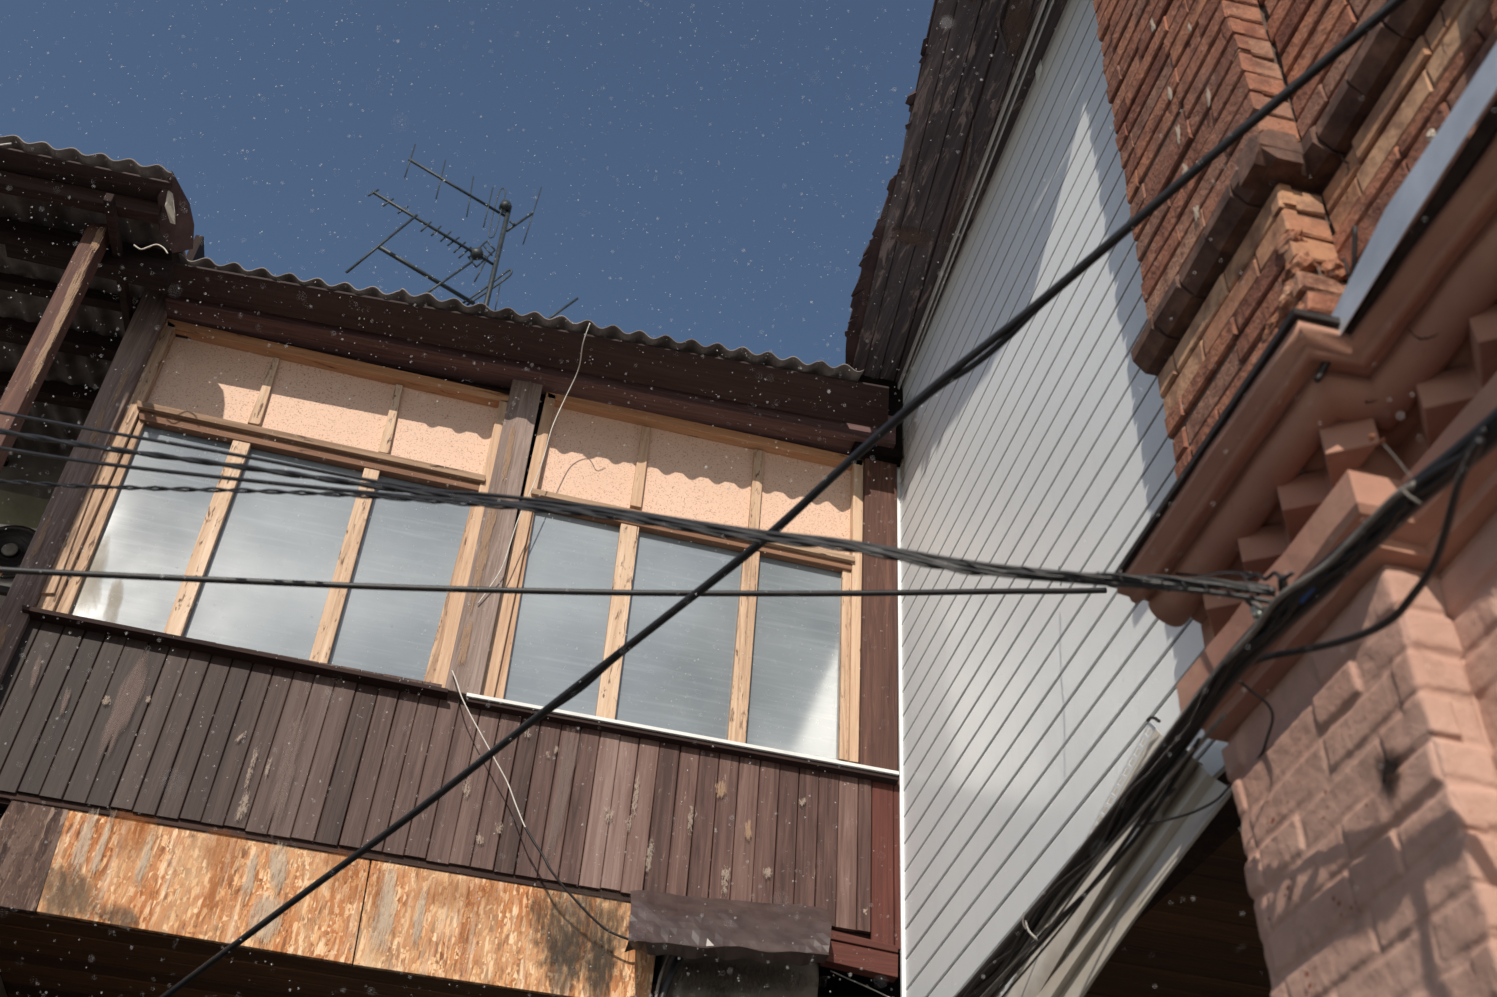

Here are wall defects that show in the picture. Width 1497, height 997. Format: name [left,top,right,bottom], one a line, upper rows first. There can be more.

spalling [1261,228,1346,342]
damp [530,889,628,997]